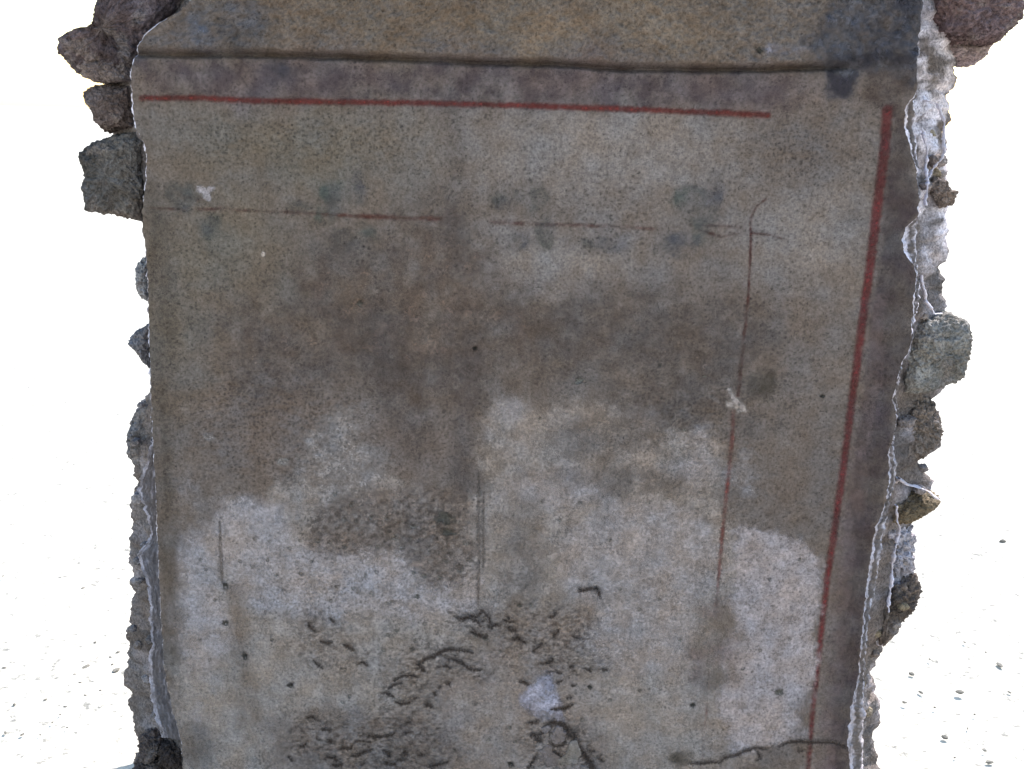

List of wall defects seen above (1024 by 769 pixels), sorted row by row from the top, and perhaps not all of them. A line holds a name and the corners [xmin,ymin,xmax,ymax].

spalling [847,34,921,769]
crack [394,586,604,681]
crack [526,718,604,769]
crack [690,739,846,765]